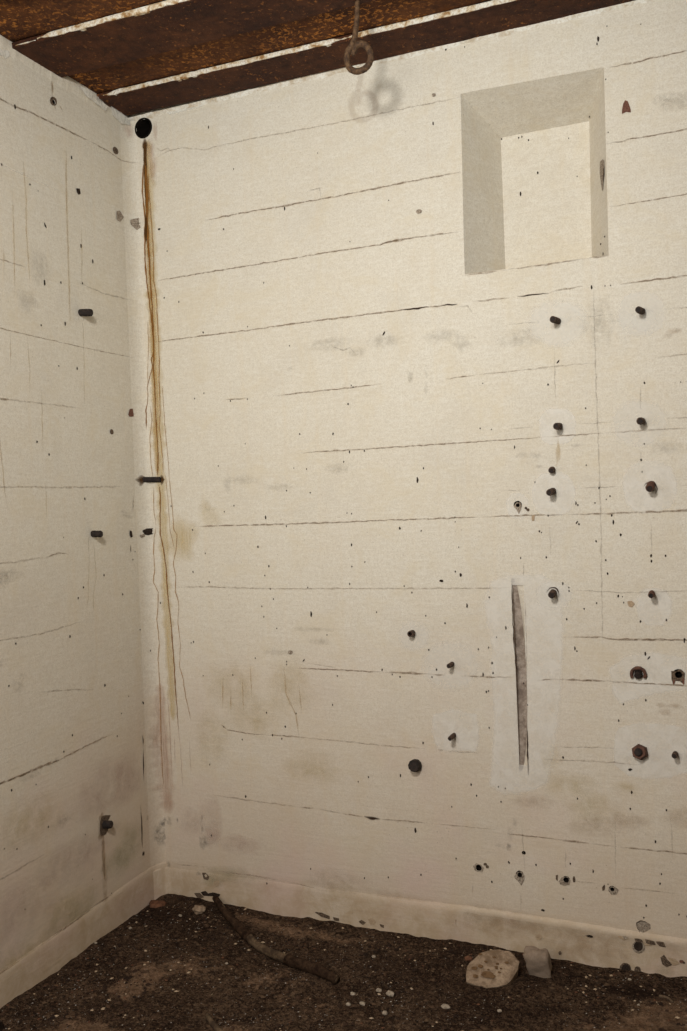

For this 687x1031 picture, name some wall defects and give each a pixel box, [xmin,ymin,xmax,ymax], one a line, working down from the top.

corrosion [137,140,190,729]